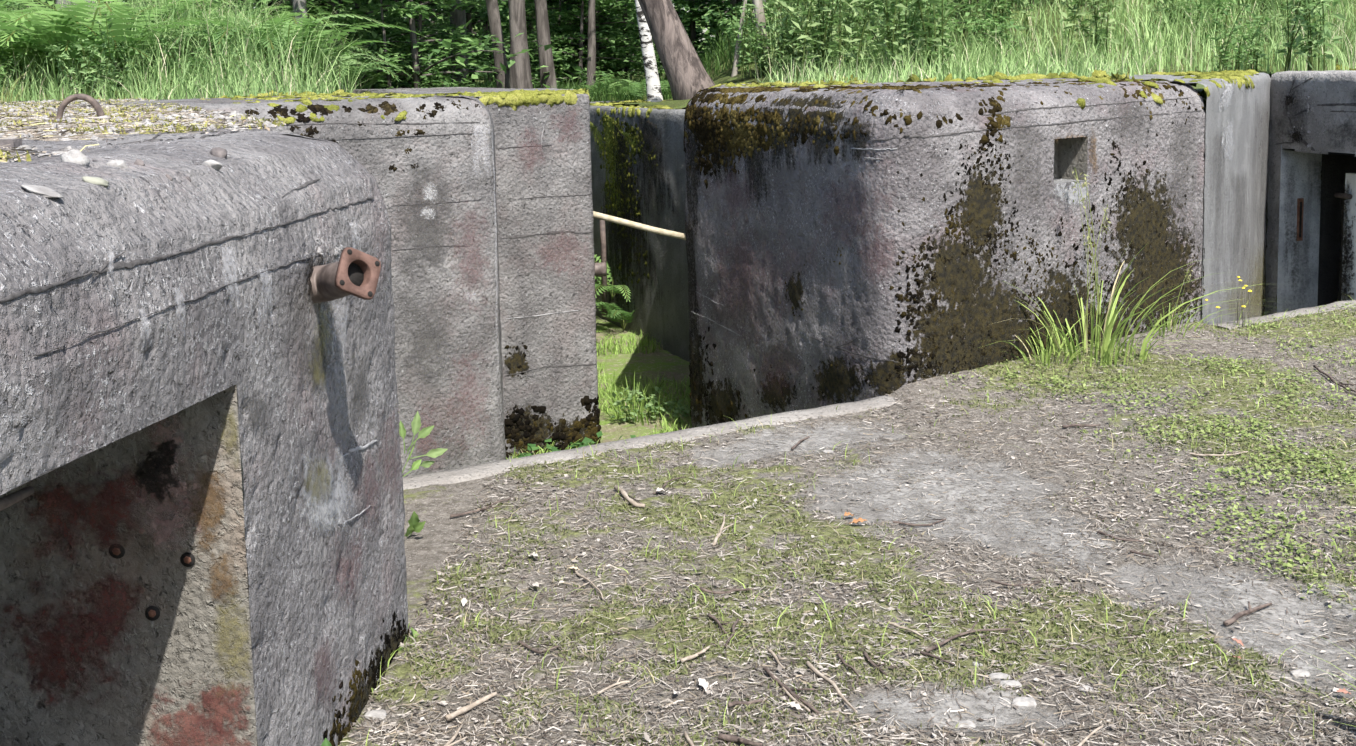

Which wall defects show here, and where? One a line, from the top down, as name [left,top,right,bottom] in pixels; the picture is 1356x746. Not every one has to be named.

damp [1054,136,1098,205]
corrosion [188,473,224,547]
corrosion [150,684,252,746]